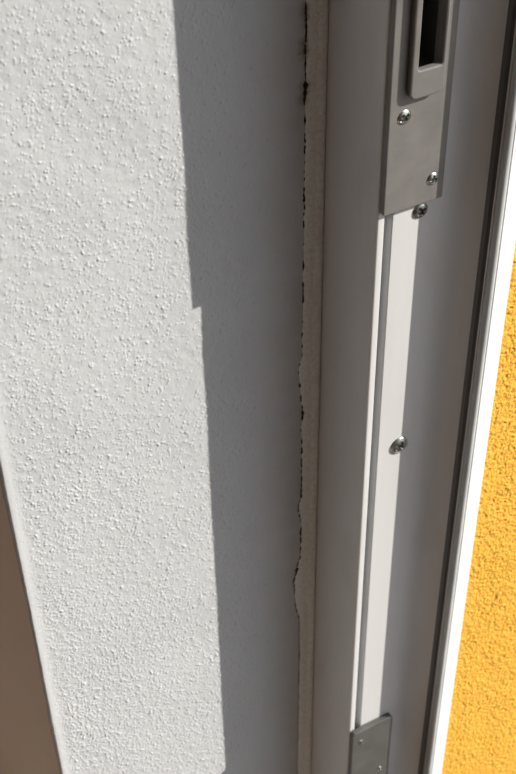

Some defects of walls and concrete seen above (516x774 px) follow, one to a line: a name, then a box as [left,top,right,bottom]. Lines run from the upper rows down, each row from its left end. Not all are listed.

crack [293,2,308,718]